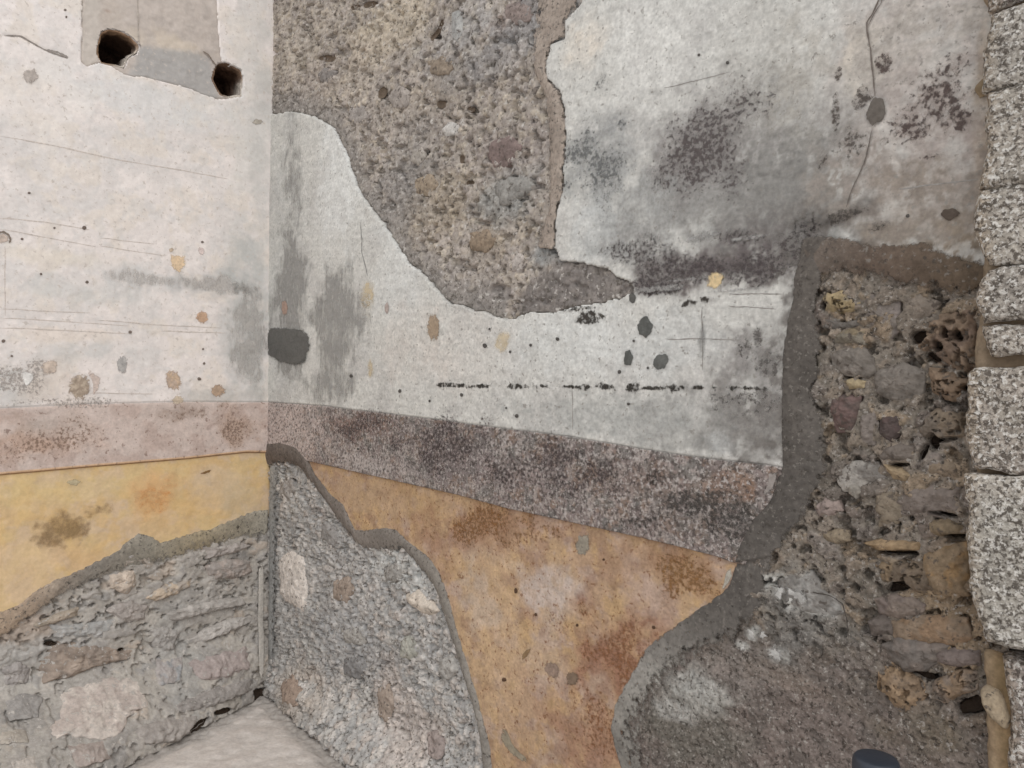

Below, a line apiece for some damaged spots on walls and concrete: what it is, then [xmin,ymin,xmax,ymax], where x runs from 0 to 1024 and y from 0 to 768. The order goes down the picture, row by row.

flaking render [81,0,229,99]
flaking render [272,0,634,319]
water stain [565,130,626,202]
water stain [653,75,776,201]
crack [846,131,872,207]
crack [866,0,882,94]
water stain [887,54,971,144]
water stain [598,218,816,307]
water stain [274,231,365,401]
water stain [565,306,604,325]
flaking render [611,236,1010,768]
flaking render [0,443,492,768]